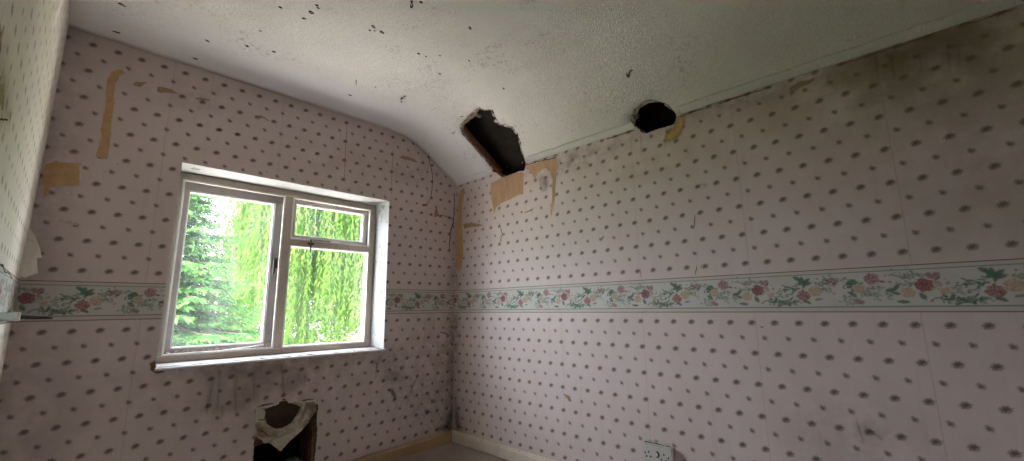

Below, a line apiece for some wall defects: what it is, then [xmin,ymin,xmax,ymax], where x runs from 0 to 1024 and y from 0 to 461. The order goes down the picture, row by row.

flaking render [460,107,525,171]
spalling [253,399,318,461]